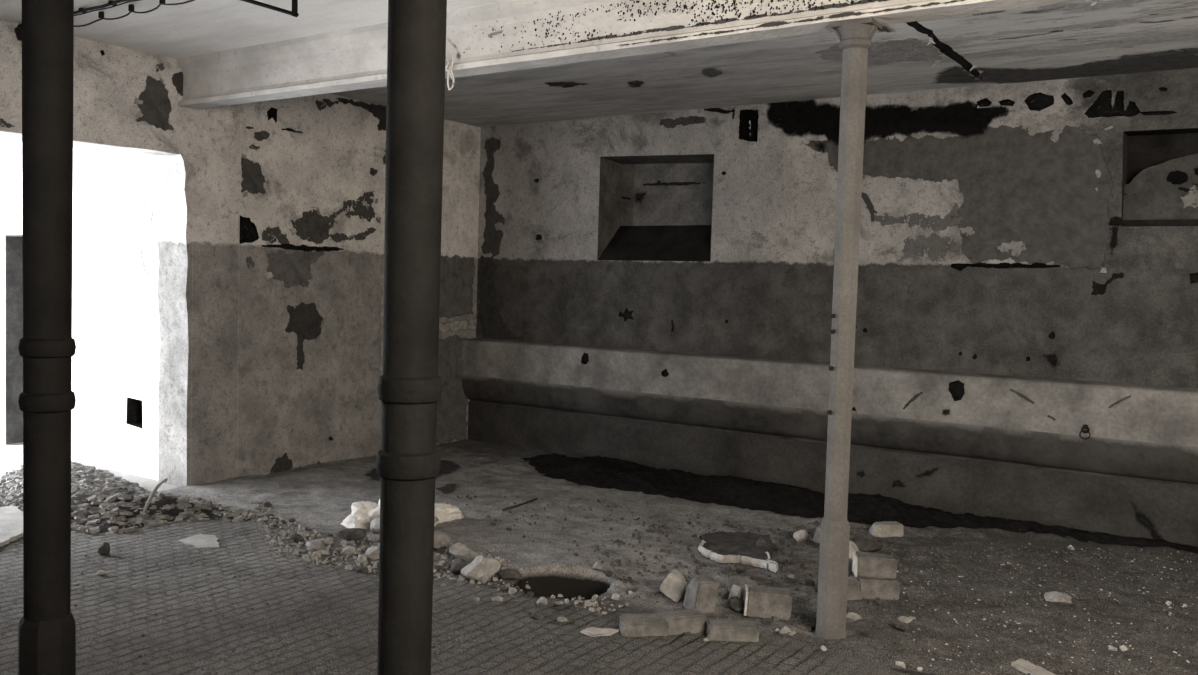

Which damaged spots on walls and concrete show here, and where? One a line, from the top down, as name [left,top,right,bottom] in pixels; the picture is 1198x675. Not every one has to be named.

peeling [134,63,183,131]
peeling [802,140,839,172]
peeling [863,90,1177,273]
peeling [239,191,381,288]
peeling [285,302,326,376]